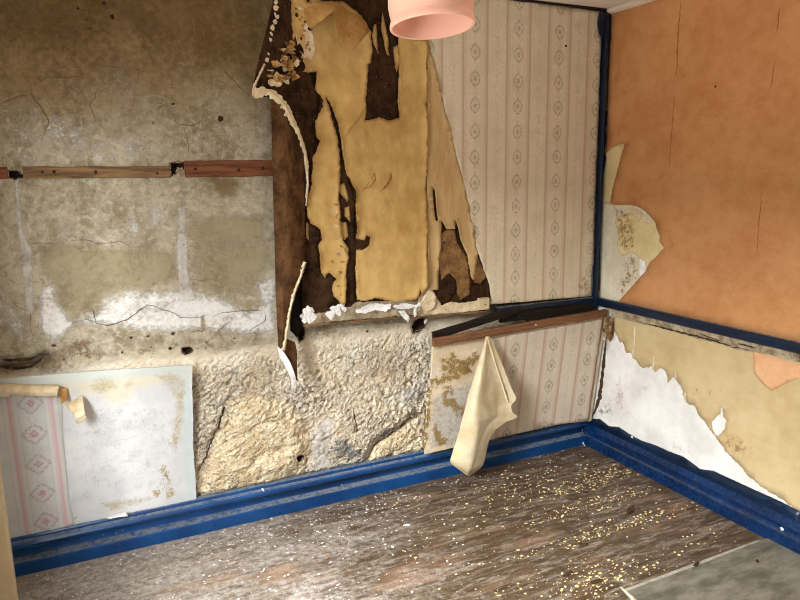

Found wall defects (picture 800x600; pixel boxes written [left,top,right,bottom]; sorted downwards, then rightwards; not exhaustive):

crack [1,74,81,140]
peeling [269,0,279,42]
peeling [295,0,400,120]
damp [41,217,275,340]
crack [72,305,266,332]
peeling [297,73,491,344]
peeling [598,204,664,301]
crack [199,399,241,471]
flaking render [199,366,311,496]
flaking render [362,417,423,462]
damp [421,352,480,448]
peeling [593,316,794,508]